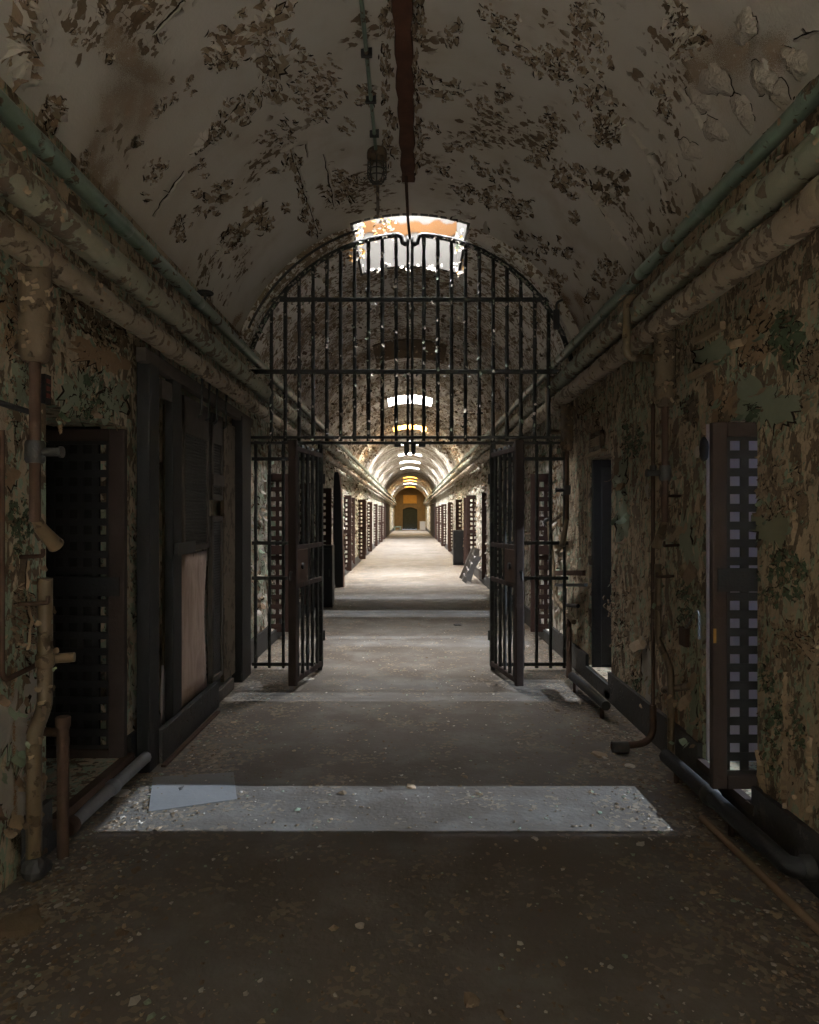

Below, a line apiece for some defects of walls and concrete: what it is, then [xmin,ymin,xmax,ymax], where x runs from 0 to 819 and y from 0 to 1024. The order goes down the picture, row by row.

crack [152,171,185,217]
peeling [0,0,819,634]
peeling [5,430,57,673]
peeling [0,685,56,838]
peeling [602,570,674,708]
peeling [757,655,806,776]